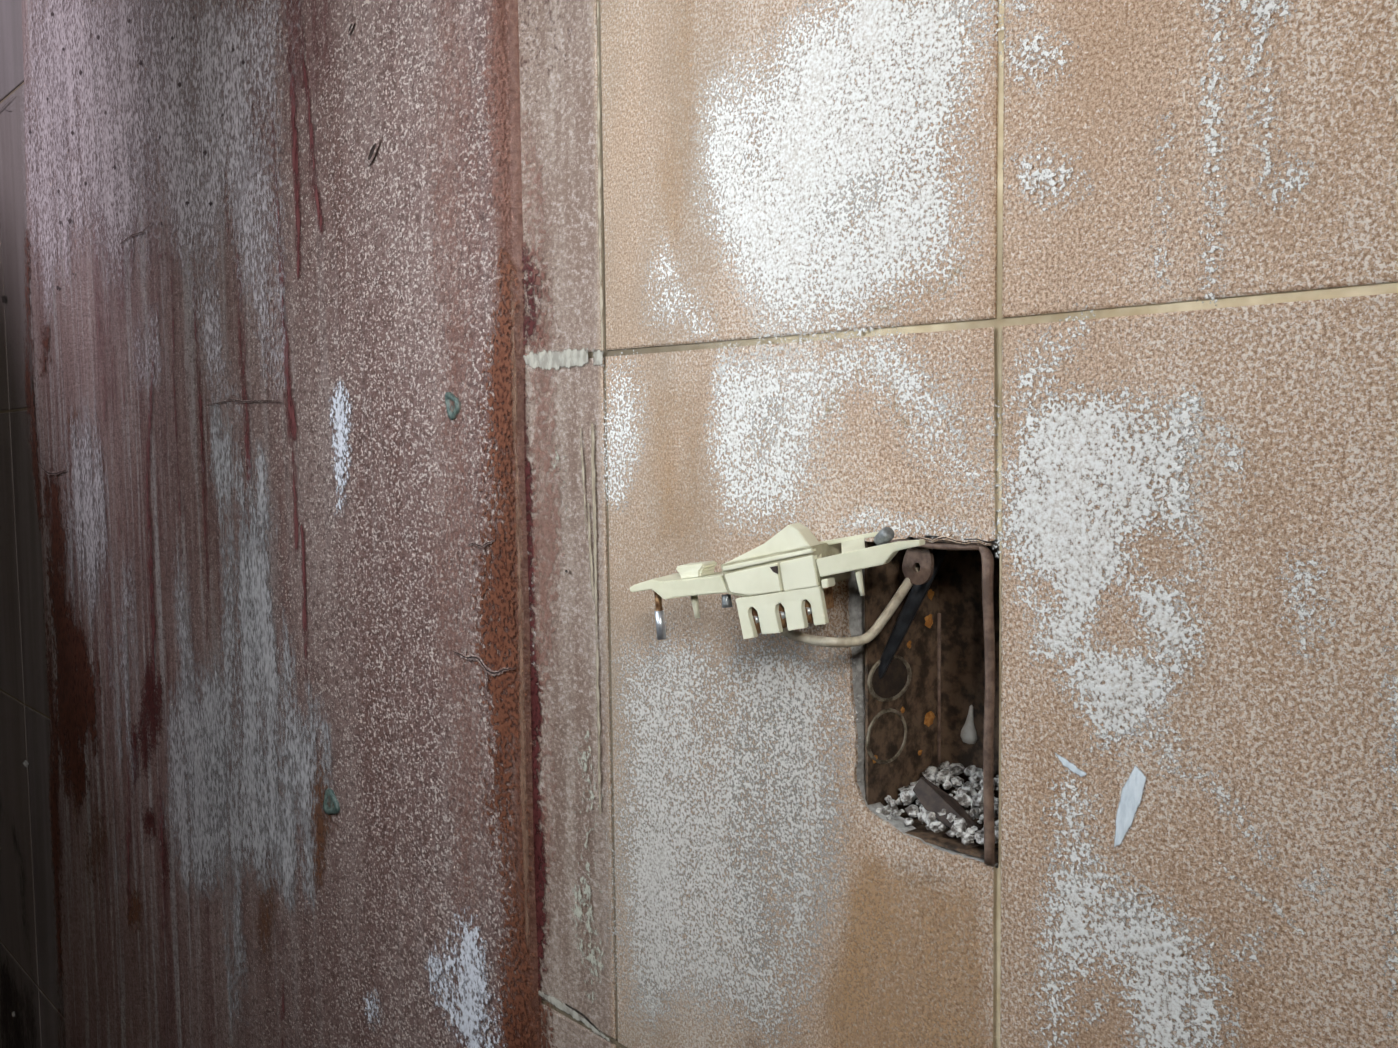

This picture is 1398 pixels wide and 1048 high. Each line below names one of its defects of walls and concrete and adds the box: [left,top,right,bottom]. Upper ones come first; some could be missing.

leakage [1197,0,1311,303]
corrosion [23,230,101,1048]
leakage [24,0,331,1017]
corrosion [463,0,570,1048]
leakage [601,350,650,509]
leakage [640,0,1277,1048]
leakage [1275,550,1336,662]
corrosion [128,651,170,895]
corrosion [307,757,330,887]
leakage [363,989,380,1029]
leakage [425,909,505,1048]